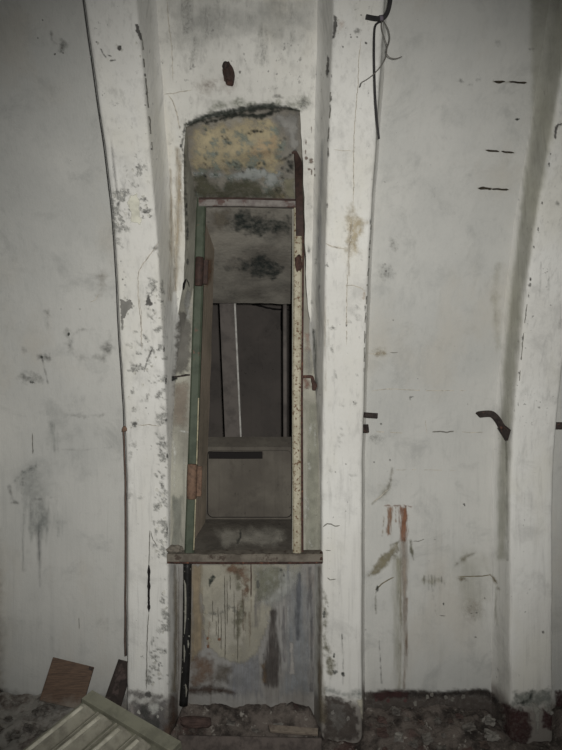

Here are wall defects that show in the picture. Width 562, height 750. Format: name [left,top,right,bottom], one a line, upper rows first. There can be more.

leakage [187,100,305,169]
mould [194,175,282,198]
corrosion [387,507,407,621]